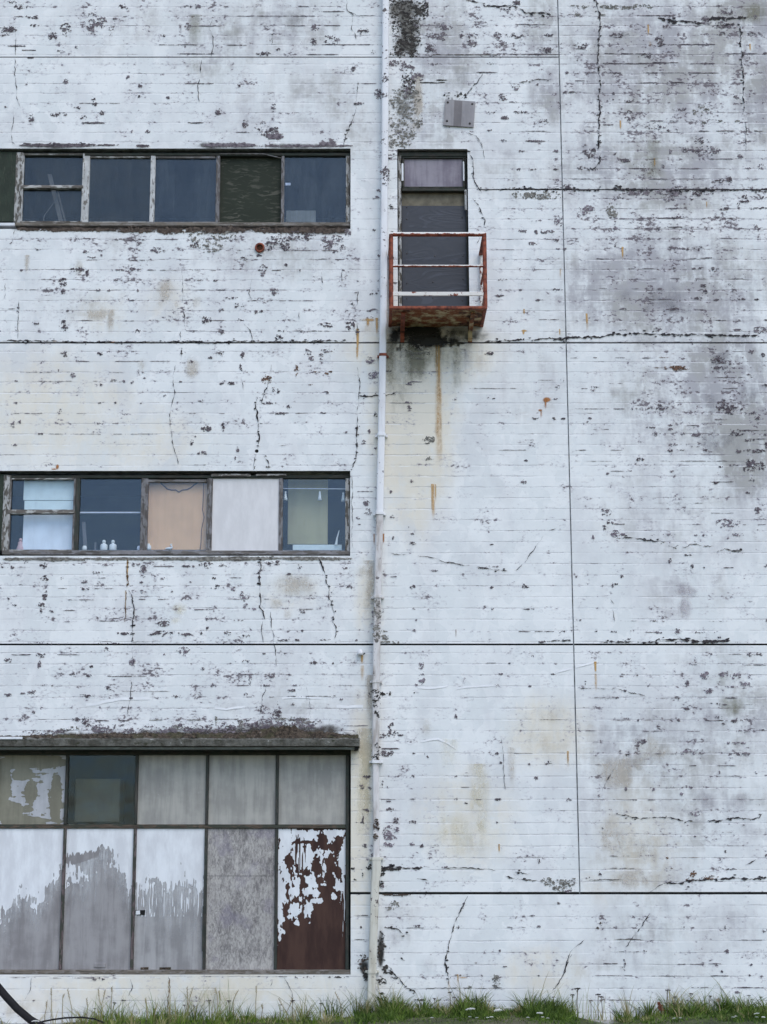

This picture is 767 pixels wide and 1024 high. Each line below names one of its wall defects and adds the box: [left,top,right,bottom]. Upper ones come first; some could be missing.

crack [467,0,767,243]
peeling [17,225,351,301]
crack [7,273,359,470]
leakage [388,327,477,374]
crack [257,559,276,655]
crack [319,559,338,637]
leakage [140,726,259,738]
leakage [298,726,346,735]
peeling [344,689,403,760]
peeling [356,775,416,848]
crack [386,896,500,996]